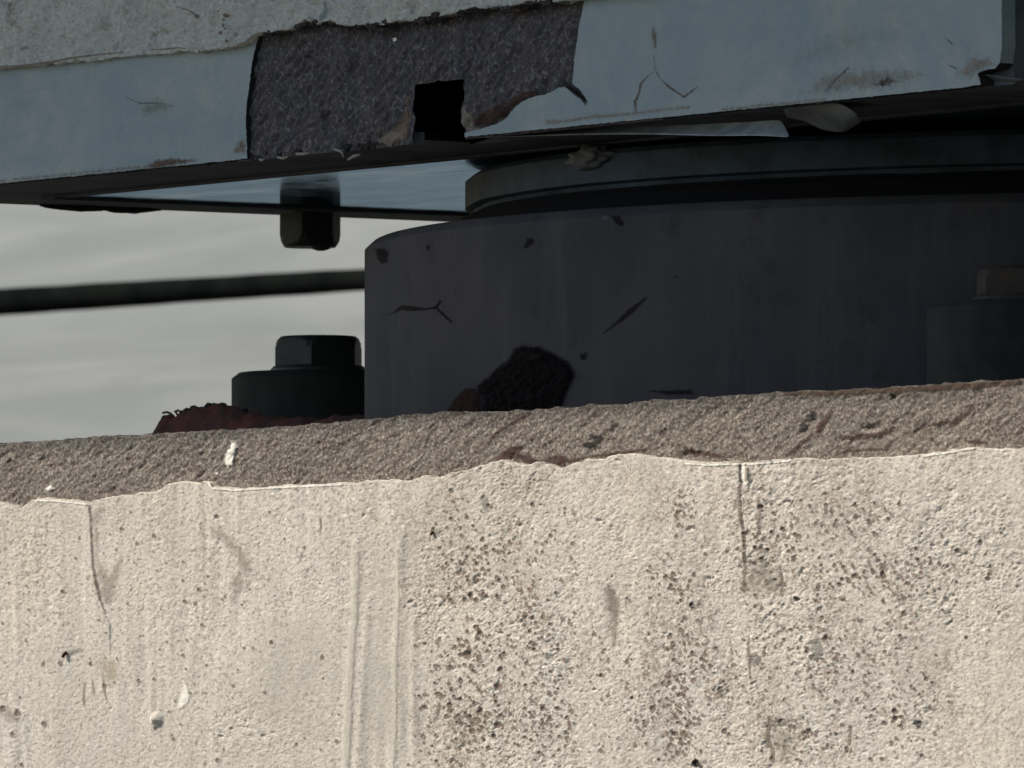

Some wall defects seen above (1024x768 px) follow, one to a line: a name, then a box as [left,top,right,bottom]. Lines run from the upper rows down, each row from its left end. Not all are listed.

peeling [235,0,861,162]
crack [633,67,695,112]
crack [88,505,105,610]
crack [737,464,783,596]